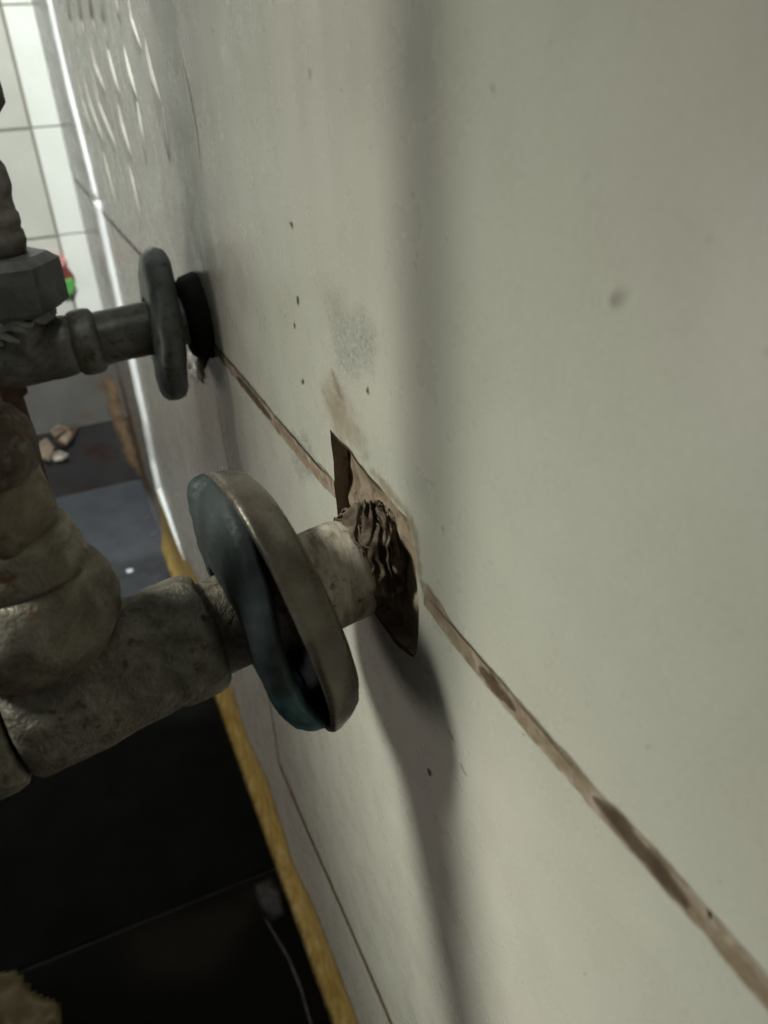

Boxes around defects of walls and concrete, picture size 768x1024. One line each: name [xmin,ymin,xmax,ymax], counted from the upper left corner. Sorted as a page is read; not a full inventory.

spalling [330,430,419,655]